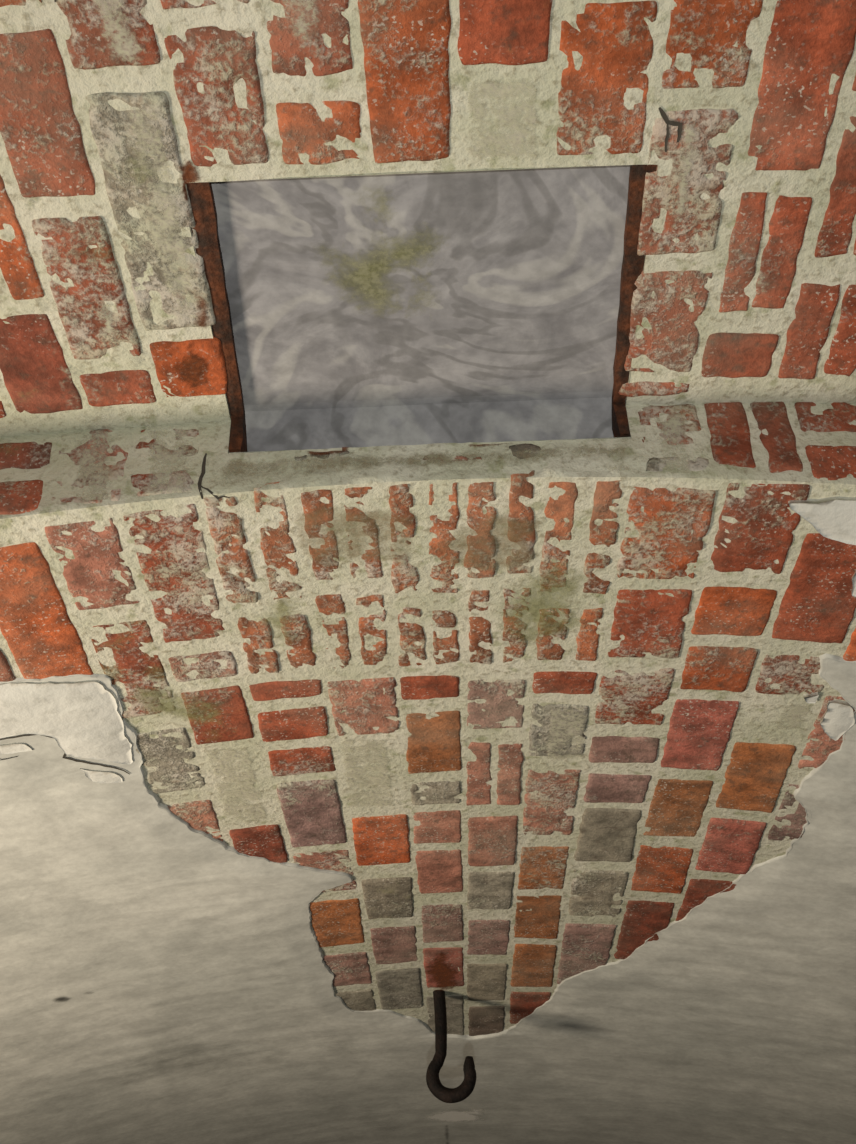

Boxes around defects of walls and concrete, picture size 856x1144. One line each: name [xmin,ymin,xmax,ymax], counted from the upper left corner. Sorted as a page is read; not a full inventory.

peeling [95,0,142,60]
peeling [130,110,194,316]
peeling [673,128,694,227]
crack [198,453,230,499]
flaking render [0,447,856,1041]